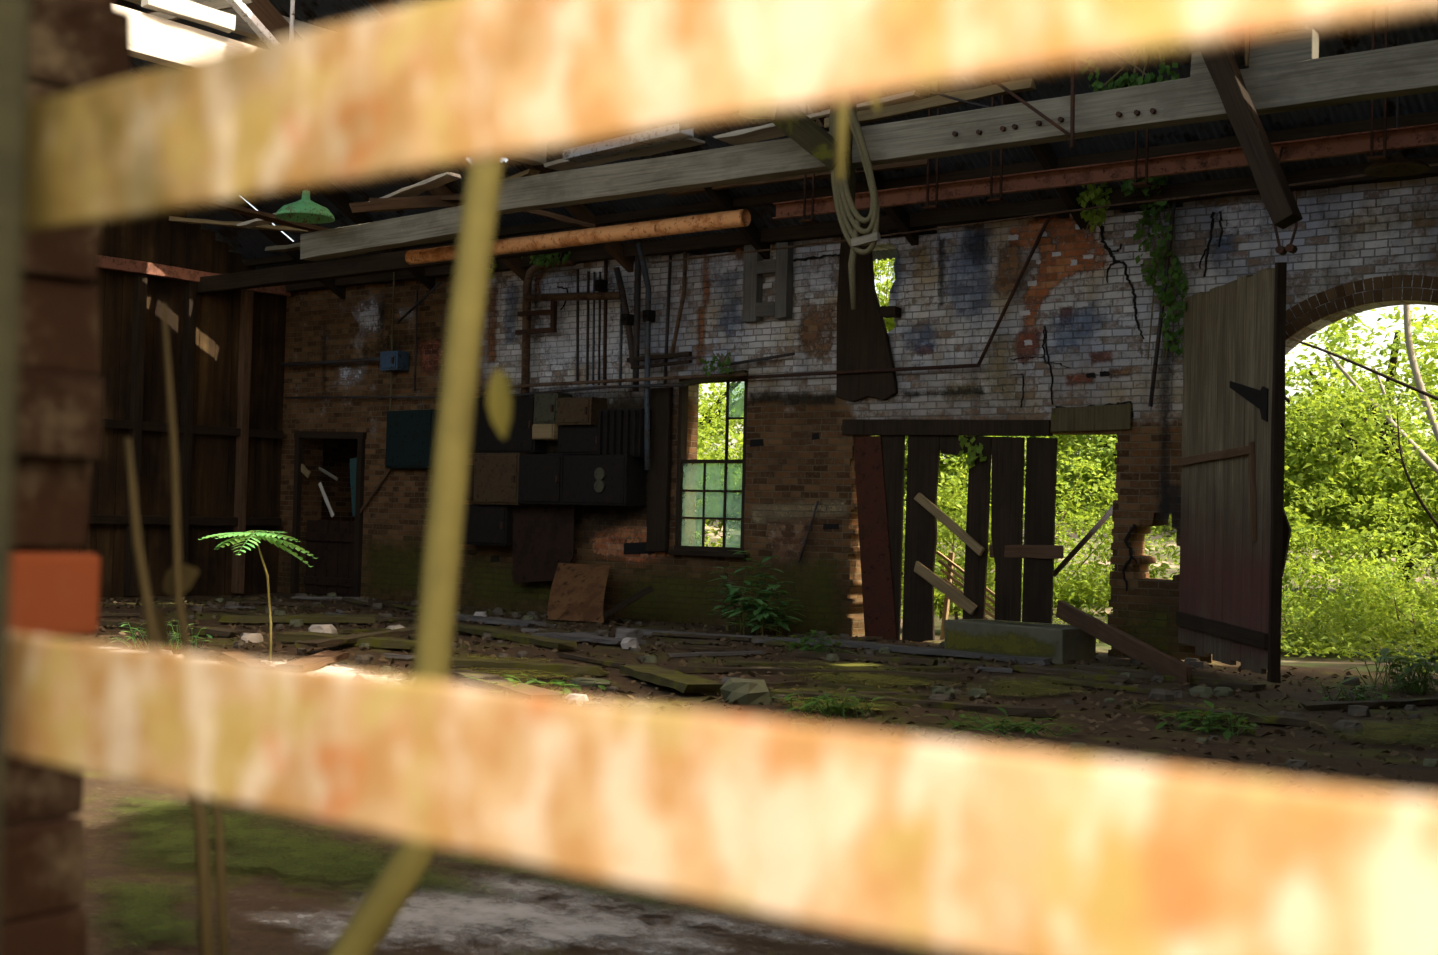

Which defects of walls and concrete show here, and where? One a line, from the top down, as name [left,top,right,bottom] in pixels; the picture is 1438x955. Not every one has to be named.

spalling [993,216,1108,364]
crack [1099,225,1144,339]
crack [1199,211,1223,277]
spalling [1066,351,1132,386]